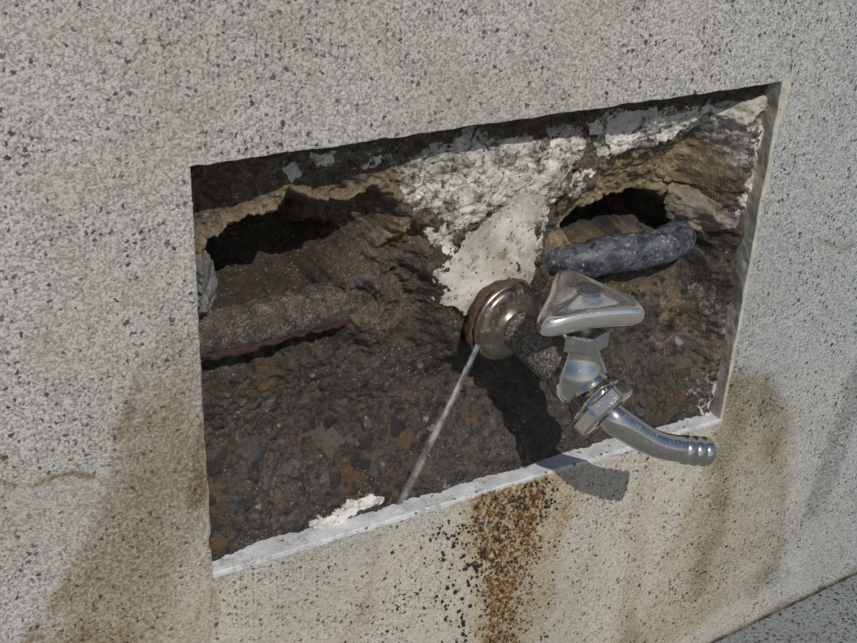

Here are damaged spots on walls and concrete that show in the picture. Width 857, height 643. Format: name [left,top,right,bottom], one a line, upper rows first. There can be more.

spalling [204,162,397,310]
peeling [308,150,337,168]
peeling [352,154,382,170]
spalling [416,103,763,282]
peeling [698,381,718,416]
rust [469,479,547,643]